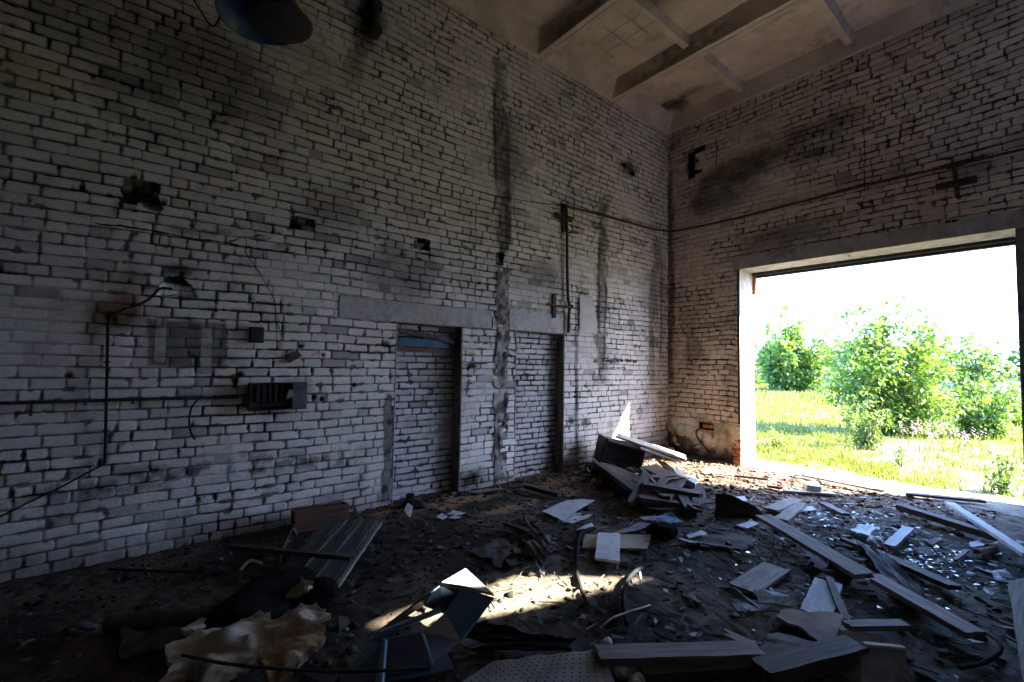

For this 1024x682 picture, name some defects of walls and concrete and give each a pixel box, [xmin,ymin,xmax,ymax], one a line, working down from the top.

spalling [118,177,164,212]